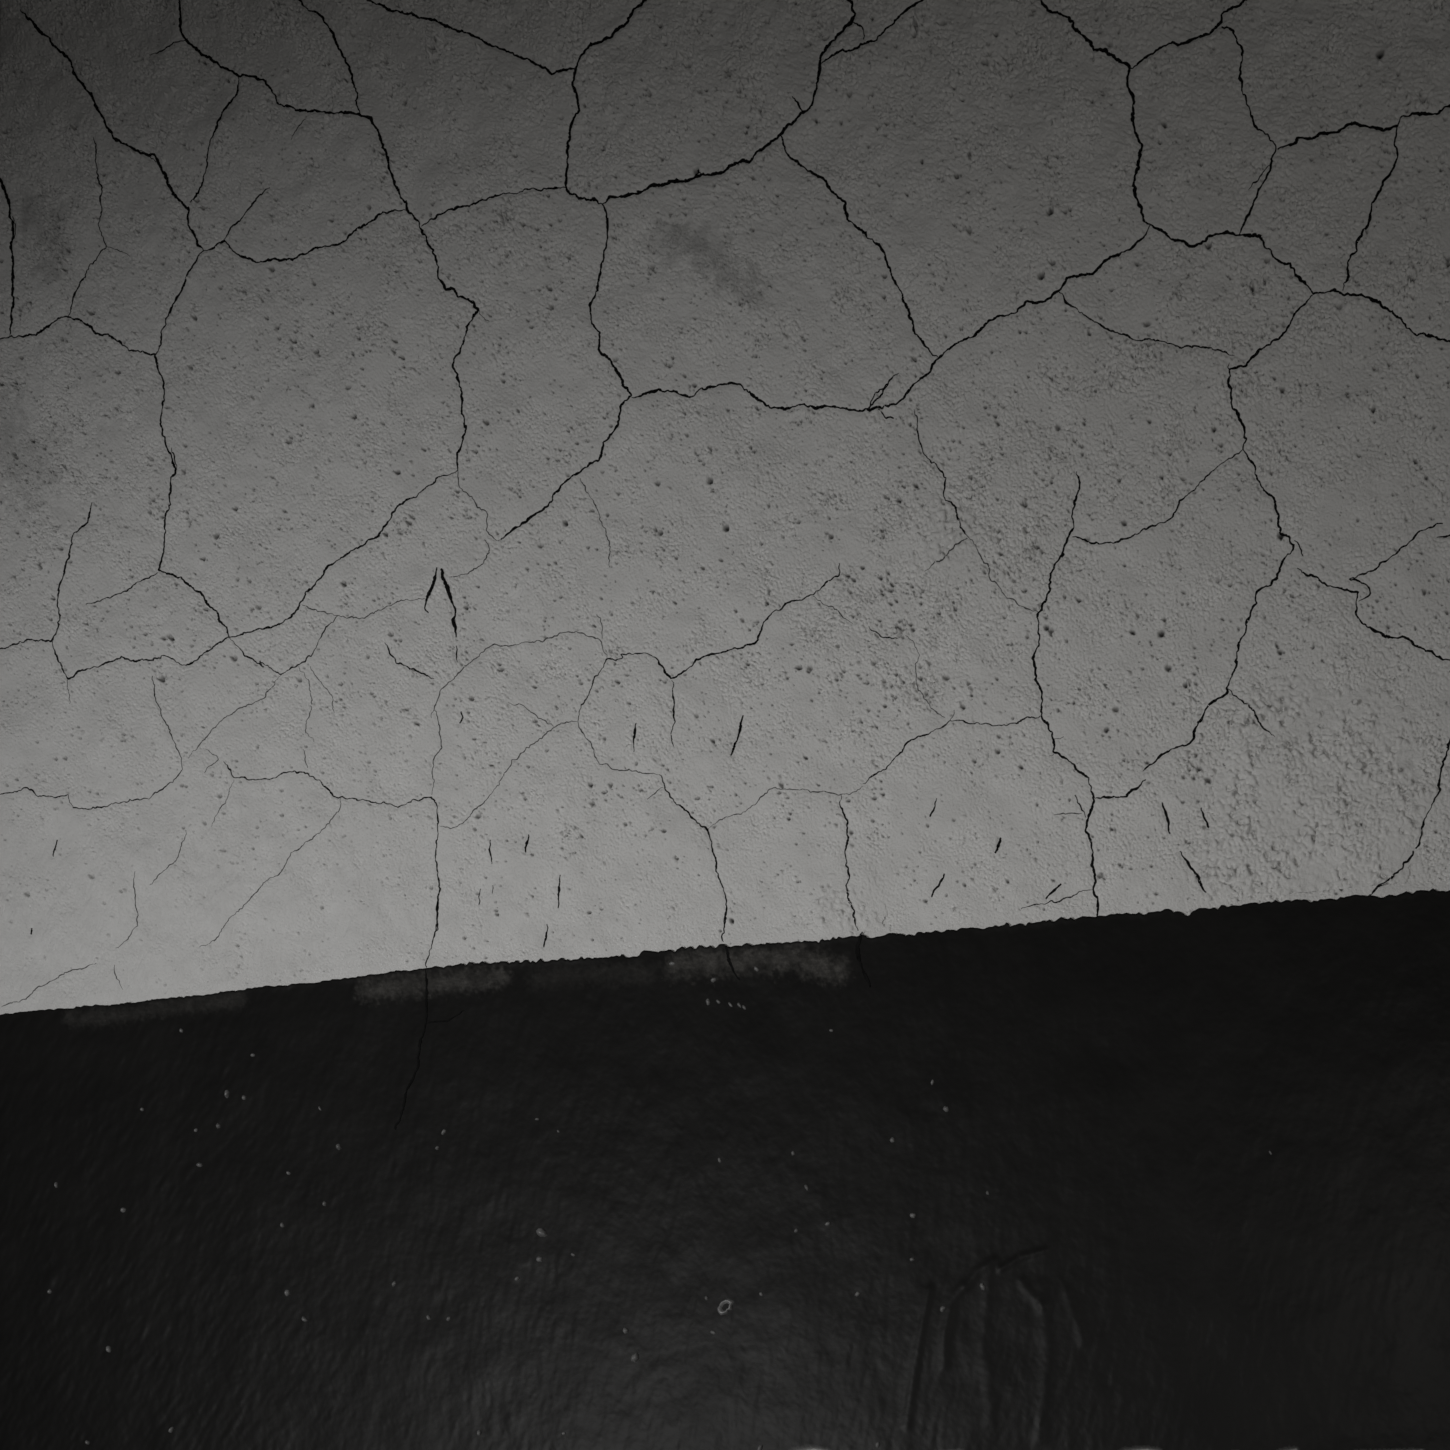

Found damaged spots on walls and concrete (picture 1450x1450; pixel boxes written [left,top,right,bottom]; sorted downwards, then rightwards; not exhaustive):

crack [0,0,1450,1130]